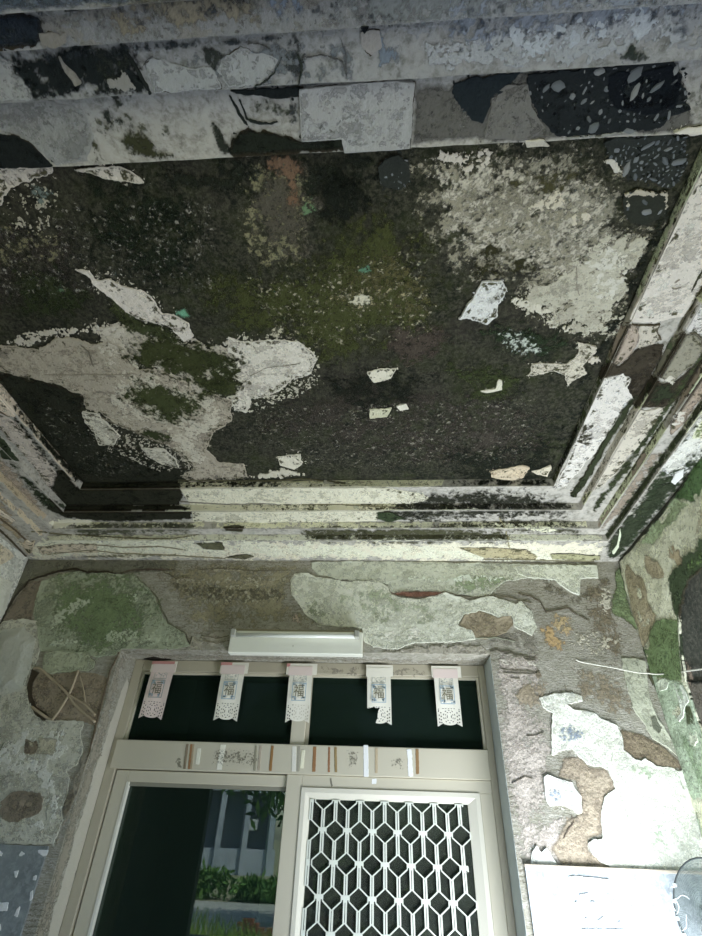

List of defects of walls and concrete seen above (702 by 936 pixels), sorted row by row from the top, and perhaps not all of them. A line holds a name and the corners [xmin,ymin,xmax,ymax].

spalling [0,134,53,169]
mould [79,130,383,290]
crack [229,38,354,129]
mould [473,242,550,281]
spalling [414,61,702,298]
damp [0,374,281,535]
damp [225,321,594,560]
damp [579,320,702,408]
flaking render [598,334,702,532]
crack [445,591,588,620]
peeling [0,544,611,845]
peeling [494,652,702,872]